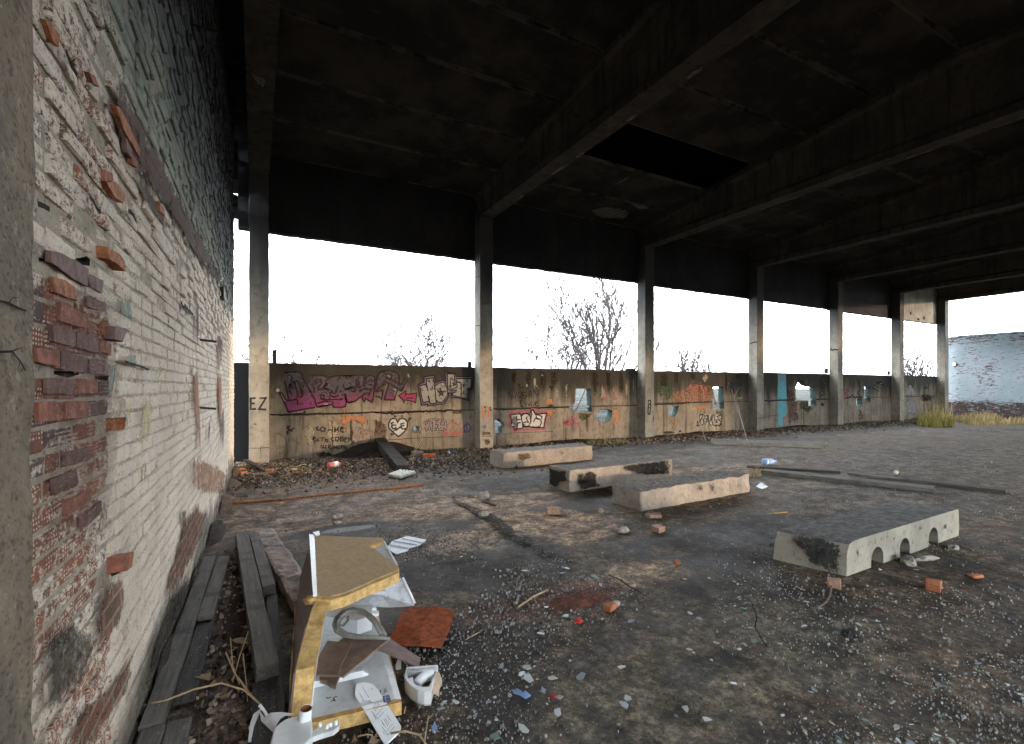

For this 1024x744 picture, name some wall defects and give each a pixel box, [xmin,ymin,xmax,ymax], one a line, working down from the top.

spalling [100,170,125,203]
spalling [109,81,222,294]
peeling [32,245,128,422]
spalling [106,417,126,432]
peeling [49,446,102,529]
spalling [193,461,224,493]
spalling [164,506,206,599]
water stain [49,624,93,708]